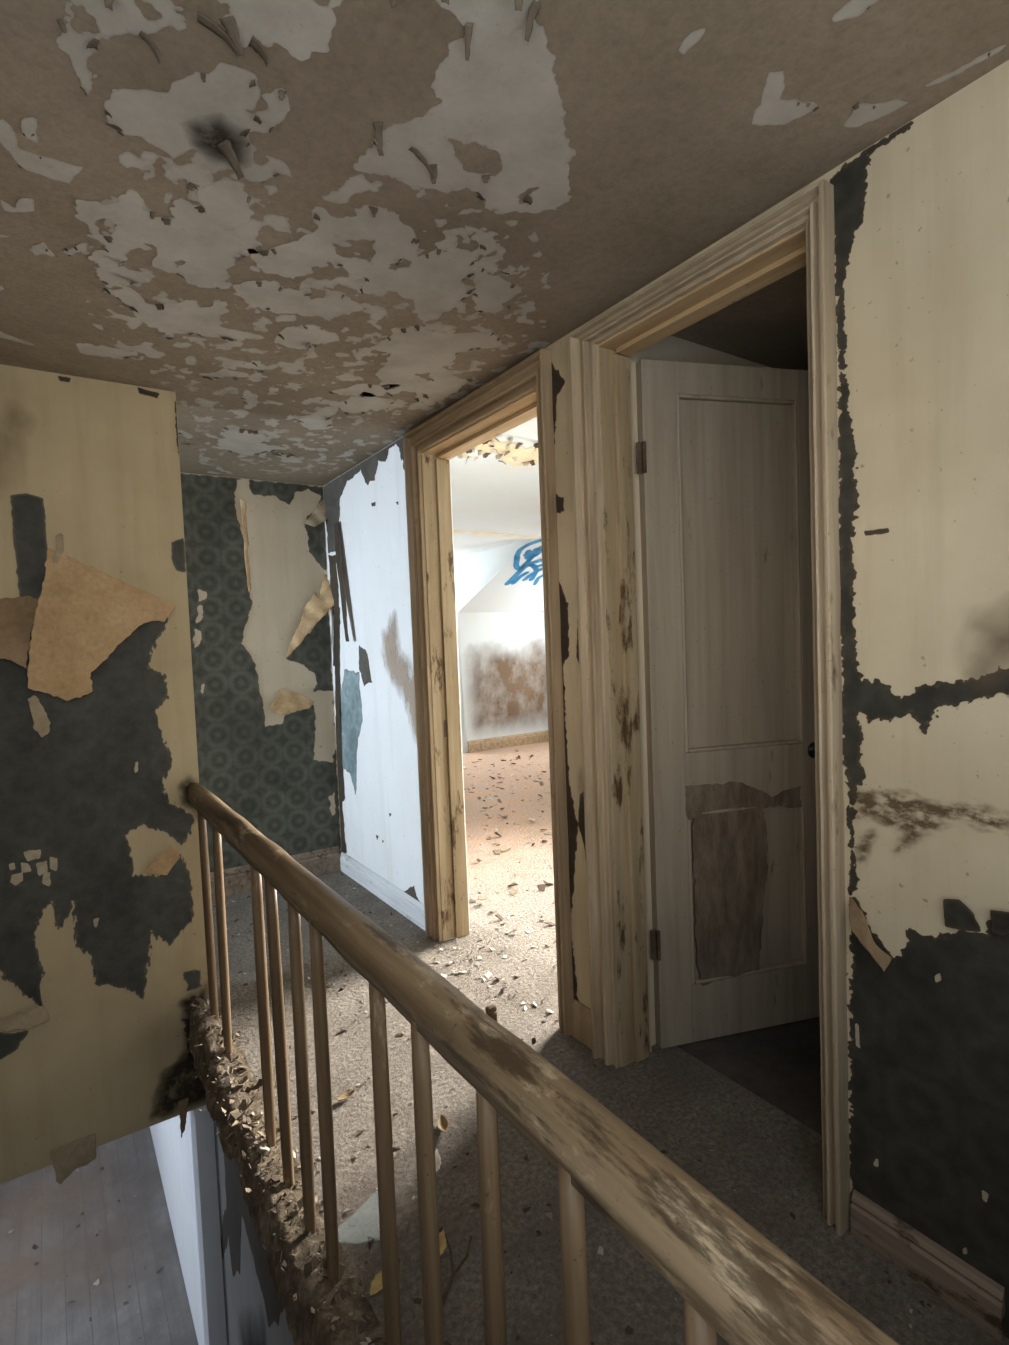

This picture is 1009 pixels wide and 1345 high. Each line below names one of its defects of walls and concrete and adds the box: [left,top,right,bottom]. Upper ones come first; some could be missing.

peeling [353,0,576,214]
peeling [0,117,83,183]
leakage [193,123,244,162]
peeling [1,197,35,212]
peeling [29,0,536,430]
peeling [216,425,303,463]
peeling [458,438,539,467]
leakage [474,645,547,727]
peeling [221,1155,284,1328]